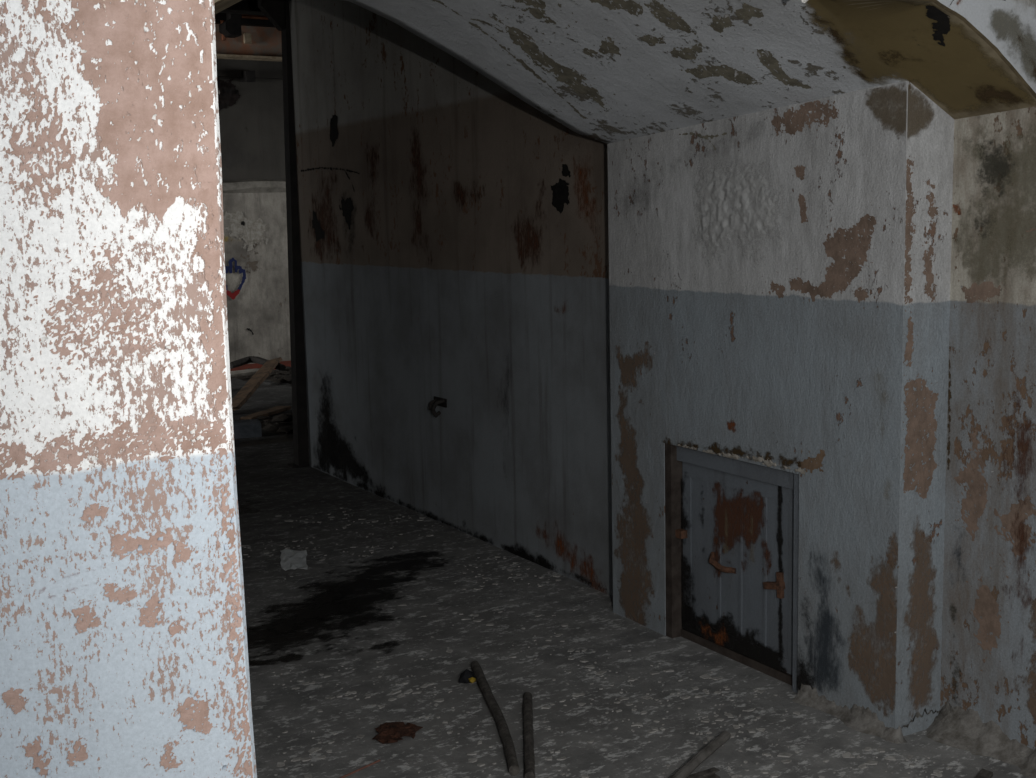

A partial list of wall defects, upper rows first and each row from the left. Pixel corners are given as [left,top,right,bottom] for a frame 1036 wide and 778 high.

peeling [488,0,617,112]
peeling [580,0,811,89]
peeling [766,99,842,141]
leakage [806,0,1036,137]
leakage [980,142,1010,195]
peeling [762,202,880,309]
peeling [0,0,270,778]
peeling [901,156,941,499]
peeling [615,342,655,626]
corrosion [701,482,771,577]
peeling [949,423,1036,672]
peeling [848,525,939,716]